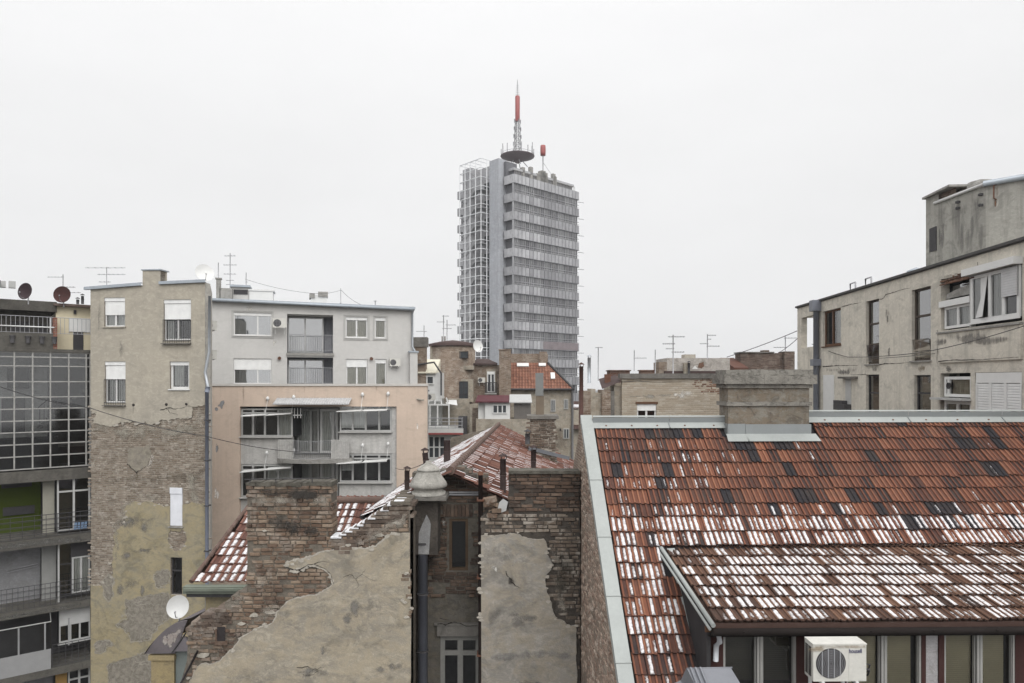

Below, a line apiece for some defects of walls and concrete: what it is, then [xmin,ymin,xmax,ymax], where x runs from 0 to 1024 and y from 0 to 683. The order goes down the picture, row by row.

flaking render [87,406,409,683]
flaking render [477,495,581,639]